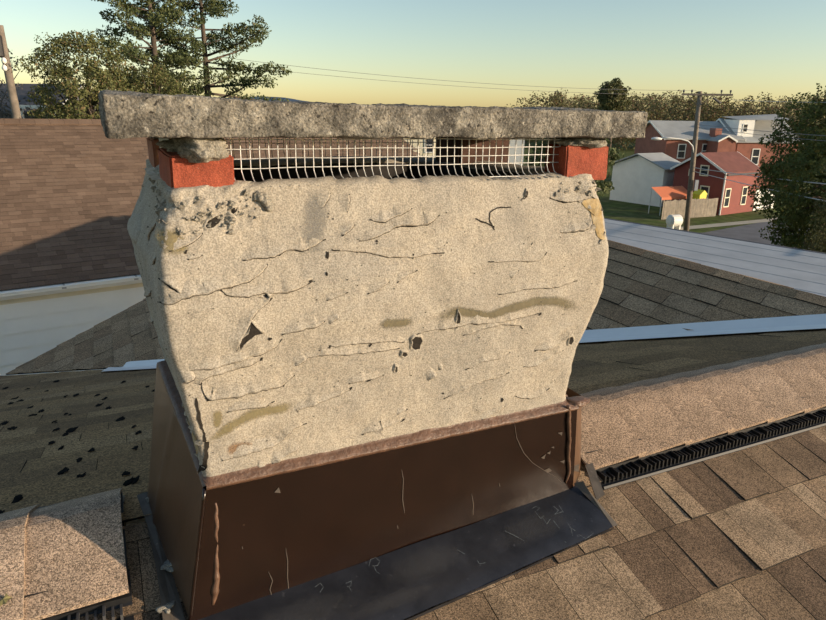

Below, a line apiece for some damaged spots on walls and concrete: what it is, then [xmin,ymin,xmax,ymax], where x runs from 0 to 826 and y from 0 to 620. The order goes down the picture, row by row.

spalling [140,178,258,235]
crack [550,175,597,233]
crack [142,190,578,474]
water stain [383,319,411,328]
water stain [446,297,571,318]
water stain [214,405,288,436]